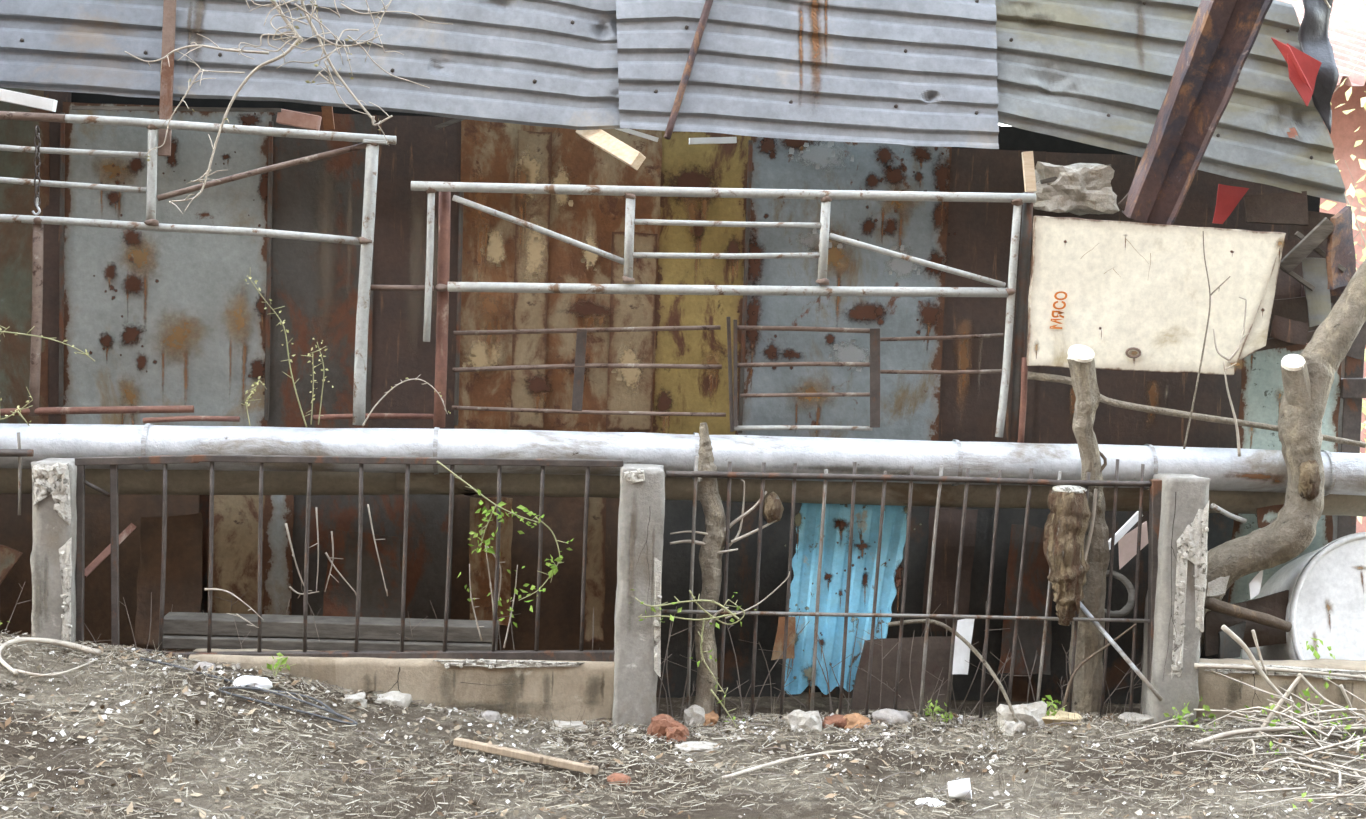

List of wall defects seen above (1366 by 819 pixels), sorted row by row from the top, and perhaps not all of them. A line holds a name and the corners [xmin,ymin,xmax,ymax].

corrosion [798,0,828,97]
corrosion [163,136,186,181]
corrosion [248,172,268,227]
corrosion [472,177,490,282]
corrosion [665,165,717,281]
corrosion [758,137,820,159]
corrosion [819,146,956,326]
corrosion [89,158,200,425]
corrosion [227,277,272,406]
corrosion [726,231,802,386]
corrosion [916,300,946,350]
corrosion [656,389,673,433]